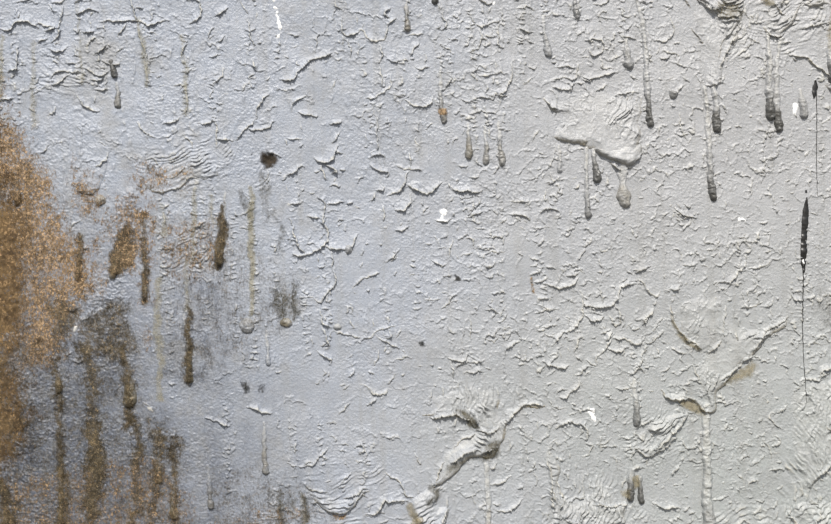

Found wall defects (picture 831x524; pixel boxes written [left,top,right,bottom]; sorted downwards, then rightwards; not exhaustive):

crack [438,0,537,108]
crack [551,0,706,146]
crack [783,6,831,89]
crack [0,0,505,385]
corrosion [0,105,229,524]
crack [424,167,779,458]
crack [204,415,231,427]
crack [246,401,273,414]
crack [286,367,405,524]
crack [365,471,414,524]
crack [489,457,536,513]
crack [650,335,831,524]